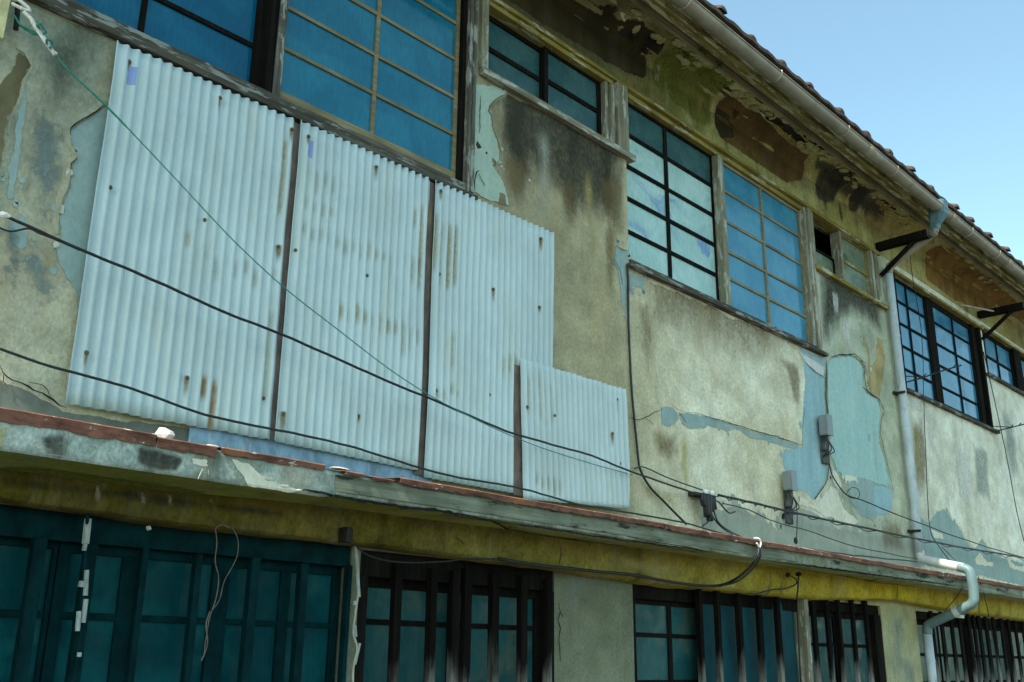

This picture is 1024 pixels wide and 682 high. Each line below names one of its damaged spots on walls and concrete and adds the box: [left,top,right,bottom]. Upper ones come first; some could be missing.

flaking render [49,99,108,306]
peeling [474,84,511,205]
water stain [506,94,618,214]
spalling [509,0,917,227]
water stain [805,161,885,219]
spalling [925,237,1024,323]
corrosion [201,378,215,426]
water stain [45,437,63,455]
water stain [138,449,182,469]
spalling [232,459,302,493]
peeling [661,335,1024,586]